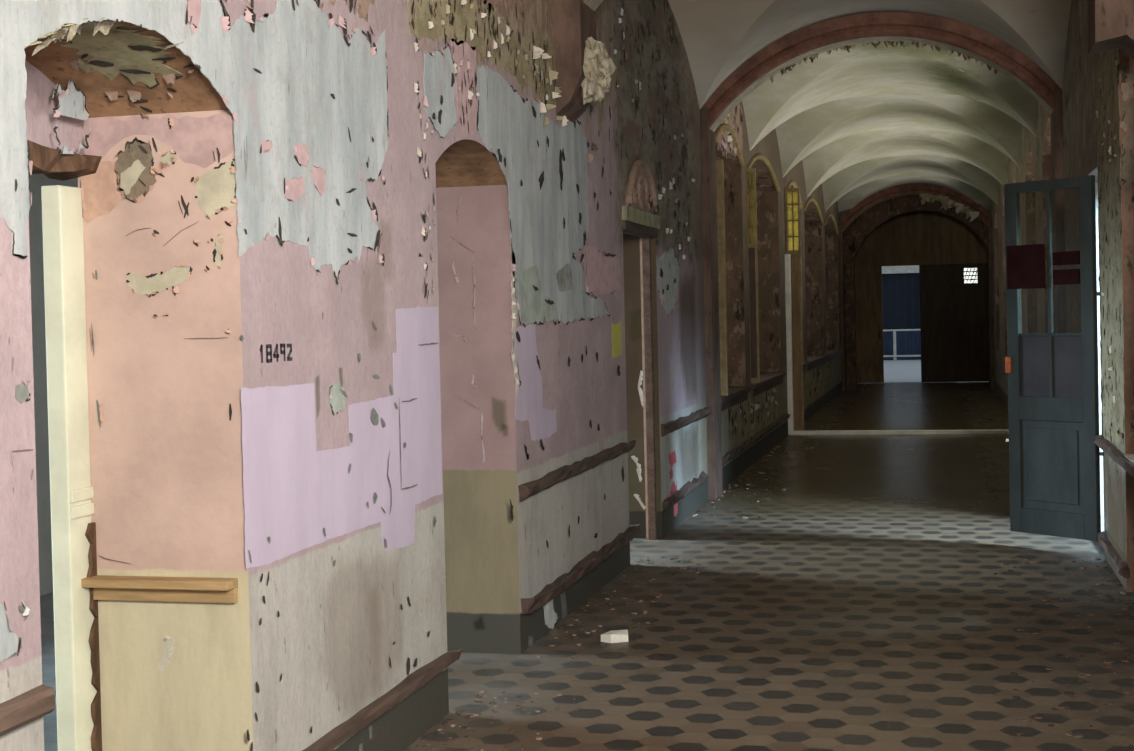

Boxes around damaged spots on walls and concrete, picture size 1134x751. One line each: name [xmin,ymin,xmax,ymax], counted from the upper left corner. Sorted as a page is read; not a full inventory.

peeling [770,41,999,83]
peeling [0,0,390,297]
peeling [408,0,660,396]
peeling [15,379,31,404]
peeling [96,400,105,428]
peeling [0,600,31,665]